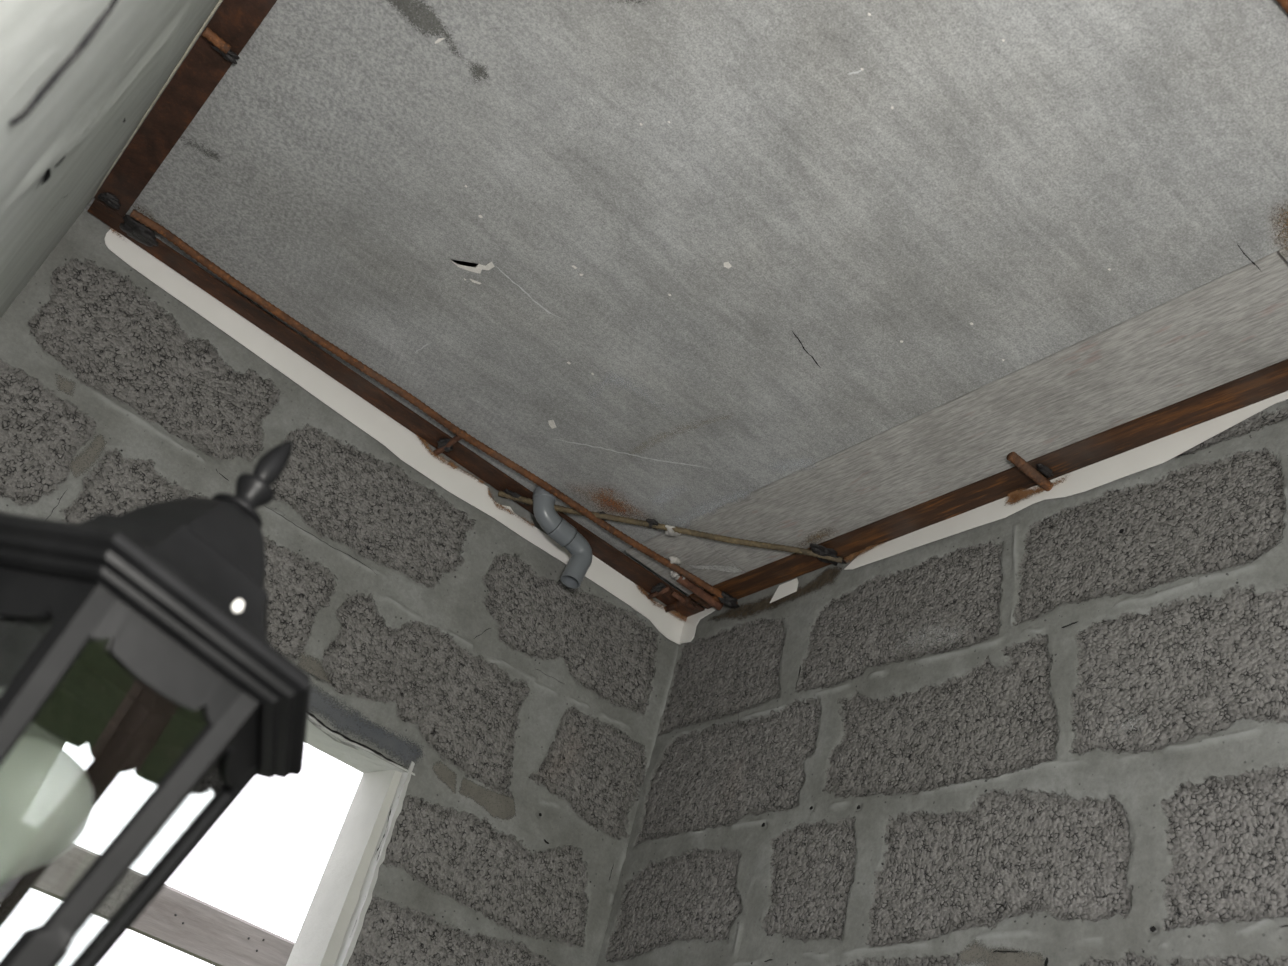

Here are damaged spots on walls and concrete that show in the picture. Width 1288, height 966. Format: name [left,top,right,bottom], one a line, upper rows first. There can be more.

crack [9,0,118,125]
leakage [387,0,488,81]